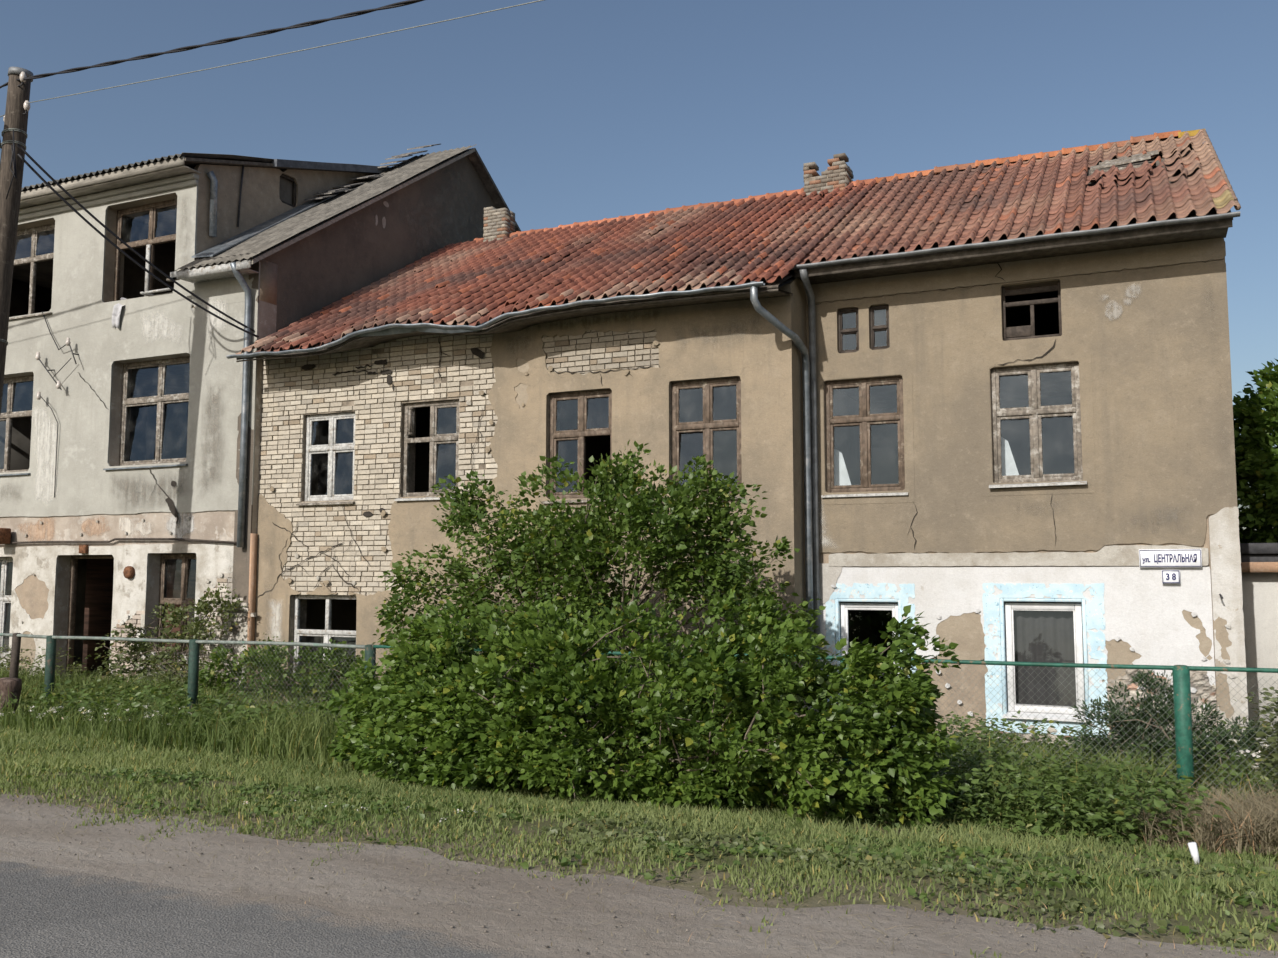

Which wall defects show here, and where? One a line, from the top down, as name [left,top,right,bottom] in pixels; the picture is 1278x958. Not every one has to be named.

flaking render [542,329,659,375]
crack [997,339,1056,365]
spalling [20,517,54,541]
spalling [15,574,49,671]
spalling [934,609,986,688]
spalling [1102,636,1175,758]
flaking render [1182,610,1235,732]
flaking render [987,723,1092,753]